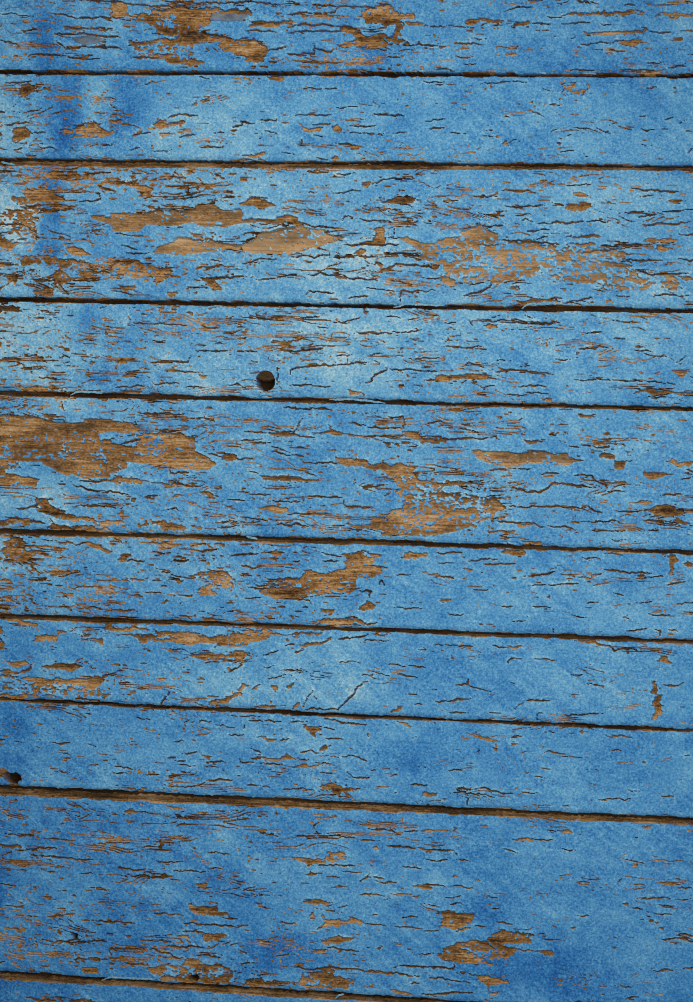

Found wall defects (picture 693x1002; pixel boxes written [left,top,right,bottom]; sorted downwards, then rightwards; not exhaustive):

peeling [108,0,297,84]
peeling [333,3,426,52]
peeling [0,126,38,160]
peeling [240,150,268,160]
peeling [0,170,693,317]
peeling [469,437,629,487]
peeling [642,456,693,482]
peeling [635,499,693,527]
peeling [0,409,544,703]
peeling [666,553,693,577]
peeling [647,678,667,723]
peeling [435,907,556,998]